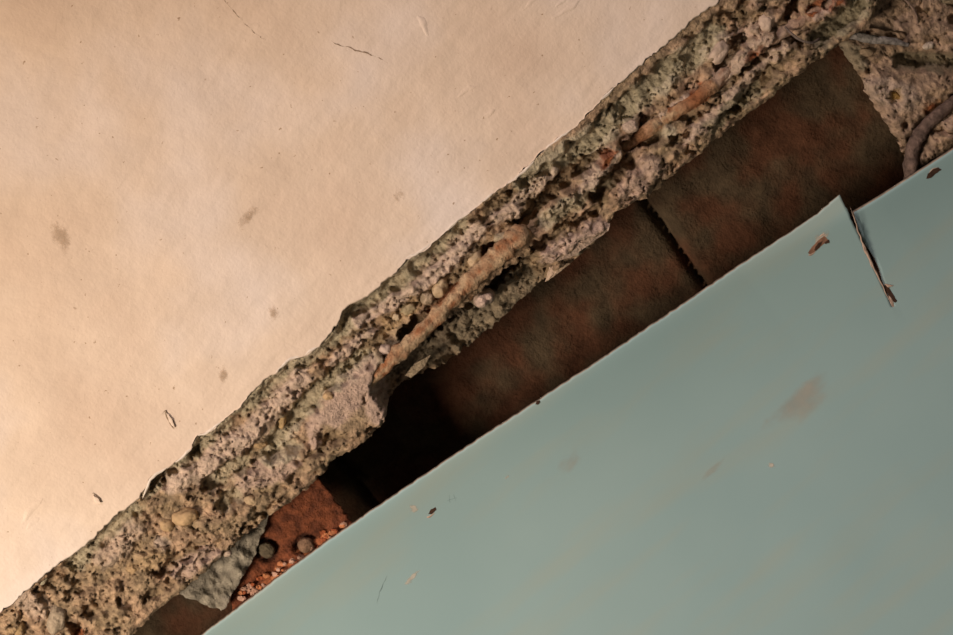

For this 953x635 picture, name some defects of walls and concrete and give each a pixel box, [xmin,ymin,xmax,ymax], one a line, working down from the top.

spalling [758,14,775,32]
spalling [769,14,812,47]
spalling [708,40,729,65]
spalling [839,0,953,180]
spalling [620,64,731,151]
spalling [556,222,610,262]
peeling [808,233,830,256]
spalling [545,263,570,282]
spalling [371,205,540,387]
spalling [159,519,175,532]
spalling [172,507,199,526]
spalling [46,605,67,635]